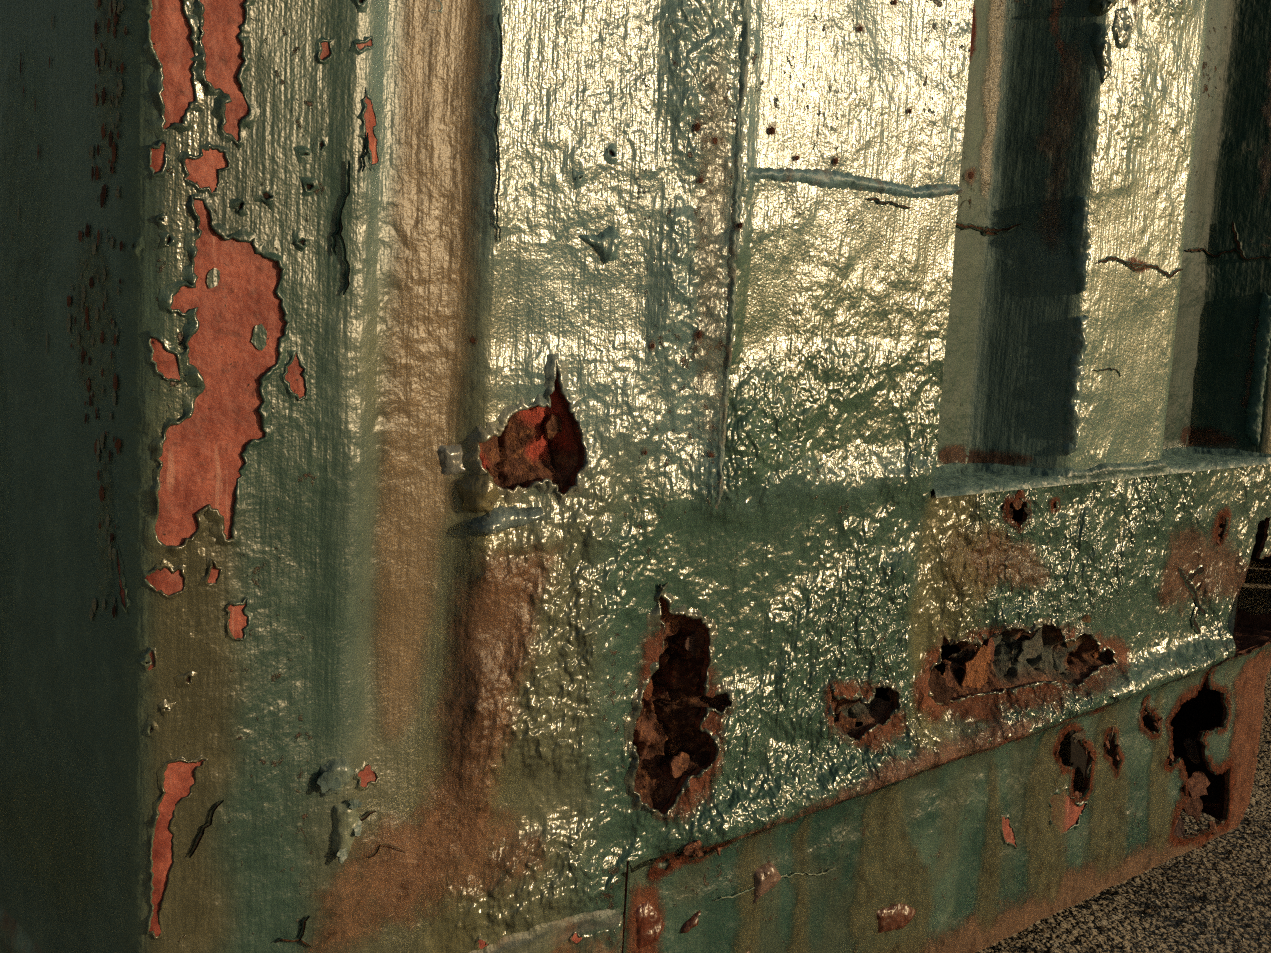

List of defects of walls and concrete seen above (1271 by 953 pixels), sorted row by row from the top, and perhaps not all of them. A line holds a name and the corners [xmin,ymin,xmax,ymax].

peeling [89,0,313,600]
spalling [66,223,123,560]
peeling [221,595,254,642]
corrosion [643,629,664,680]
corrosion [671,666,723,817]
peeling [145,755,208,940]
corrosion [627,856,685,953]